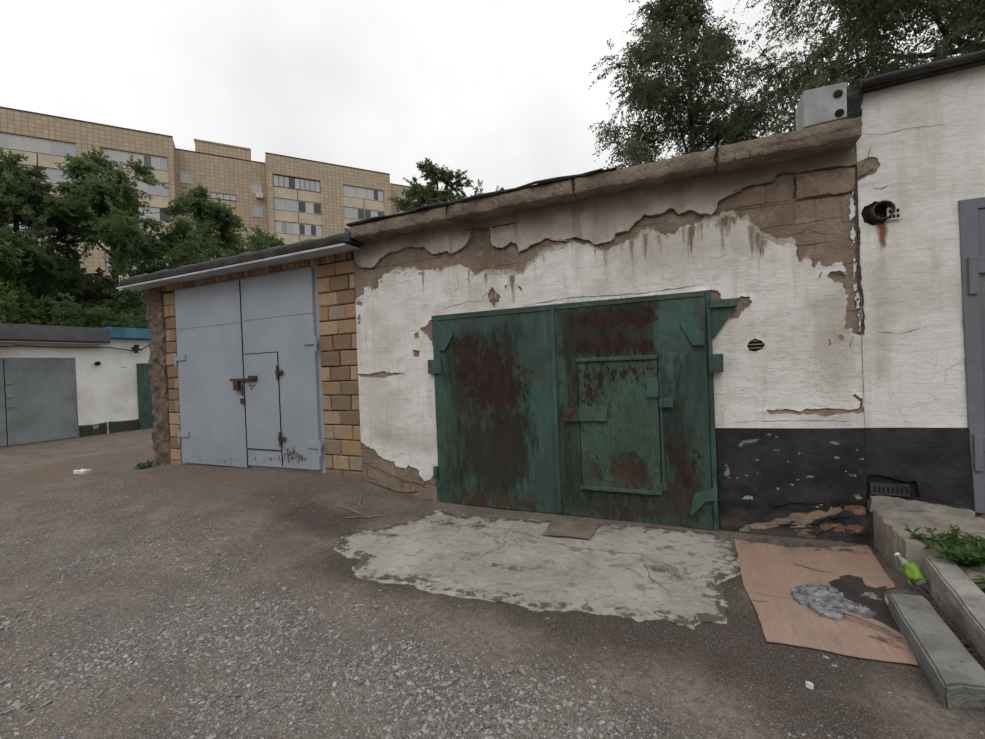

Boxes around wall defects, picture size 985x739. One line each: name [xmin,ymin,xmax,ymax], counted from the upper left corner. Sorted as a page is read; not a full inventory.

flaking render [354,147,880,346]
corrosion [877,224,887,247]
spalling [413,316,434,357]
corrosion [560,302,662,423]
spalling [767,398,864,417]
flaking render [362,443,439,499]
corrosion [561,434,715,528]